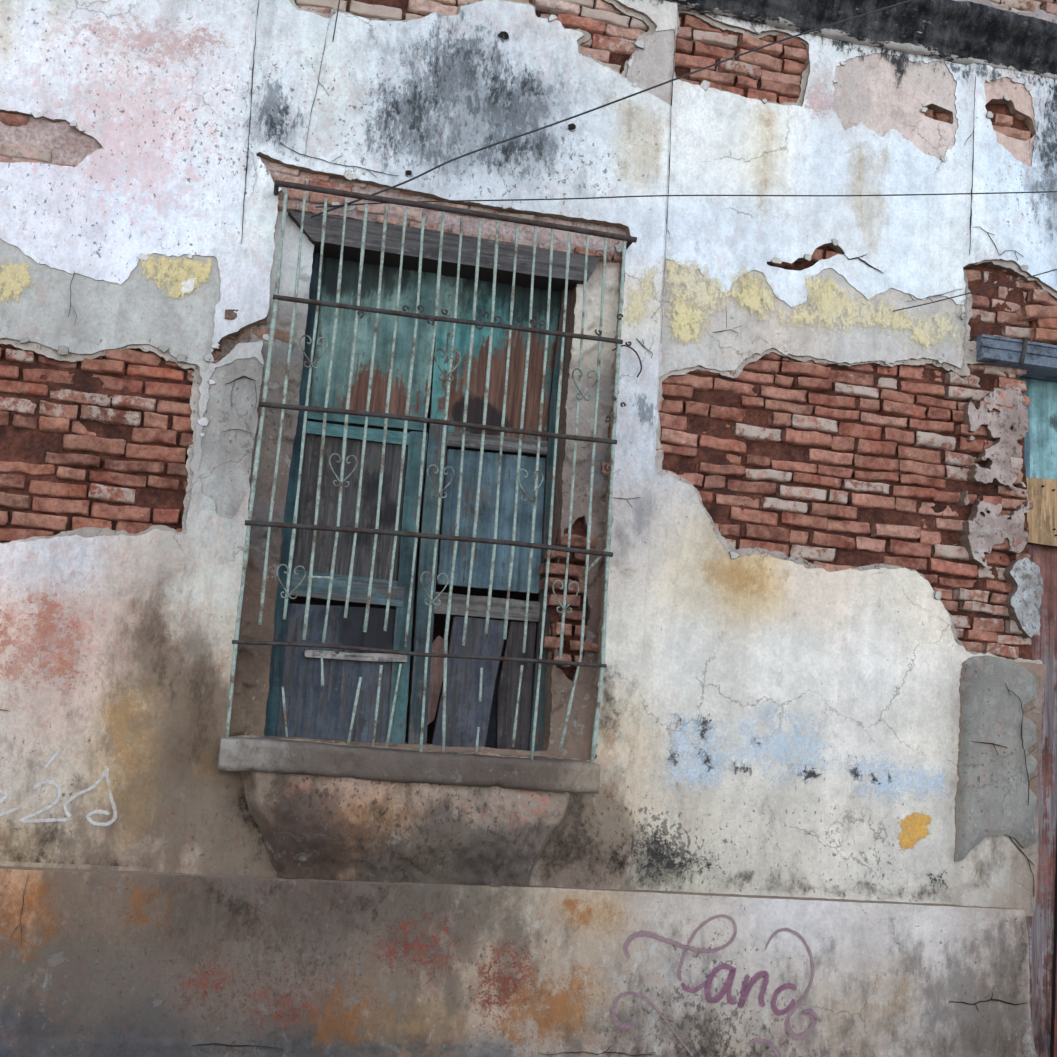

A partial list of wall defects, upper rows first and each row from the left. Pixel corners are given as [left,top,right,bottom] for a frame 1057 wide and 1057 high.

spalling [289,0,483,22]
damp [385,36,473,146]
damp [487,69,541,113]
damp [491,137,545,166]
spalling [502,0,809,106]
peeling [832,53,958,163]
peeling [984,77,1036,167]
spalling [0,239,290,544]
spalling [655,238,1057,664]
damp [618,821,722,889]
crack [949,993,1027,1010]
crack [540,1046,654,1056]